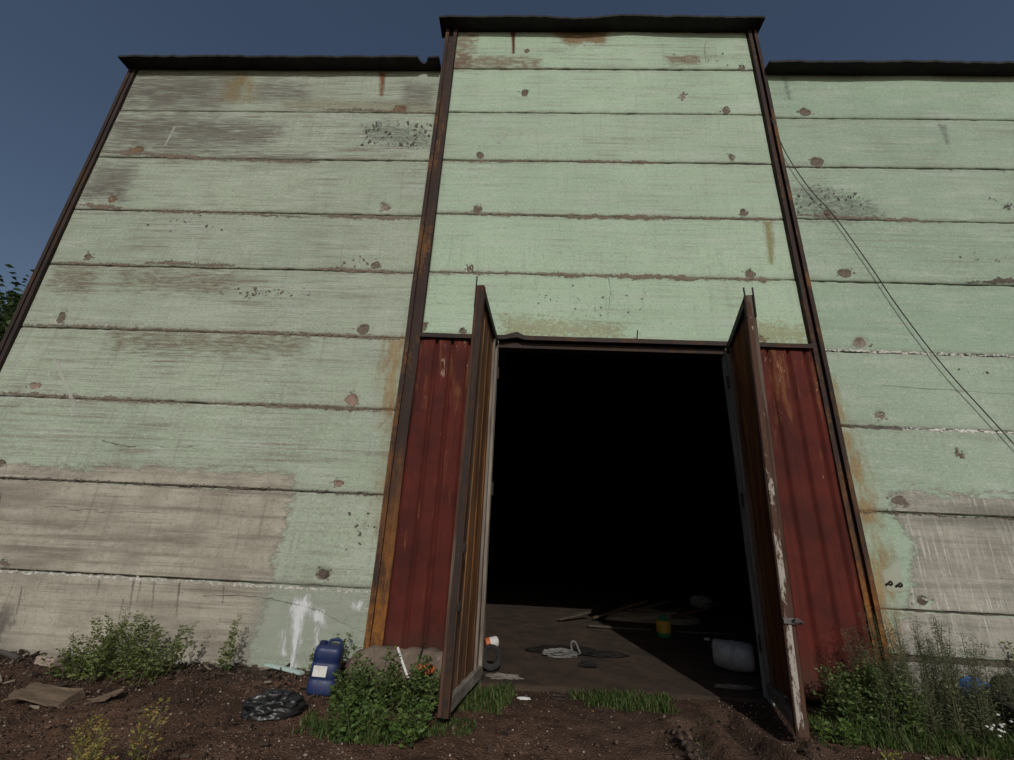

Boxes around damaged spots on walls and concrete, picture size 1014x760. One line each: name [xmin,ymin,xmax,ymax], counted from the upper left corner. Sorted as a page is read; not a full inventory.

rust [454,32,537,68]
rust [556,32,606,43]
peeling [0,459,381,667]
peeling [859,484,1014,660]
damp [309,609,325,645]